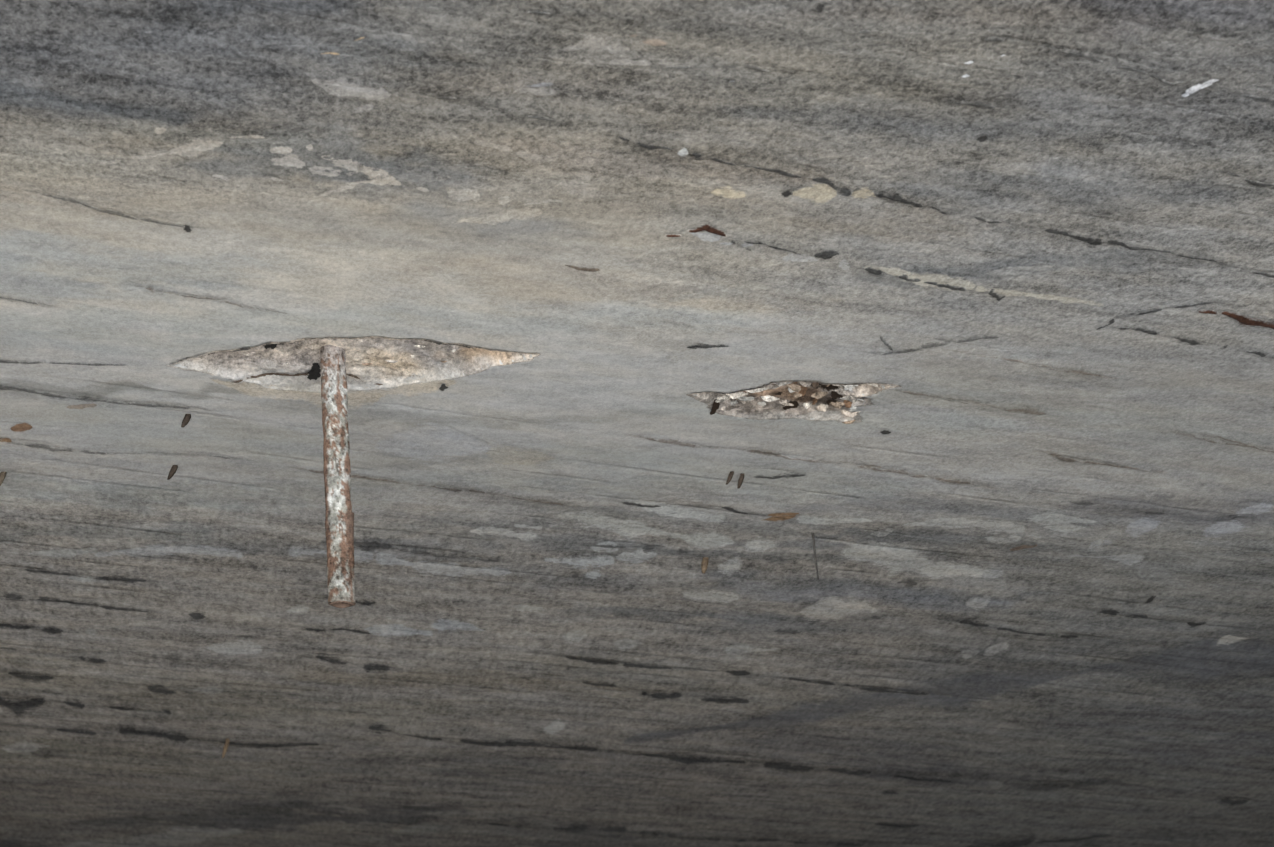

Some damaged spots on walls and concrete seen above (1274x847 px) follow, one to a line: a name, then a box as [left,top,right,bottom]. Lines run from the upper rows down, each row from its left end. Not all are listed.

spalling [165,336,540,393]
spalling [687,381,901,424]